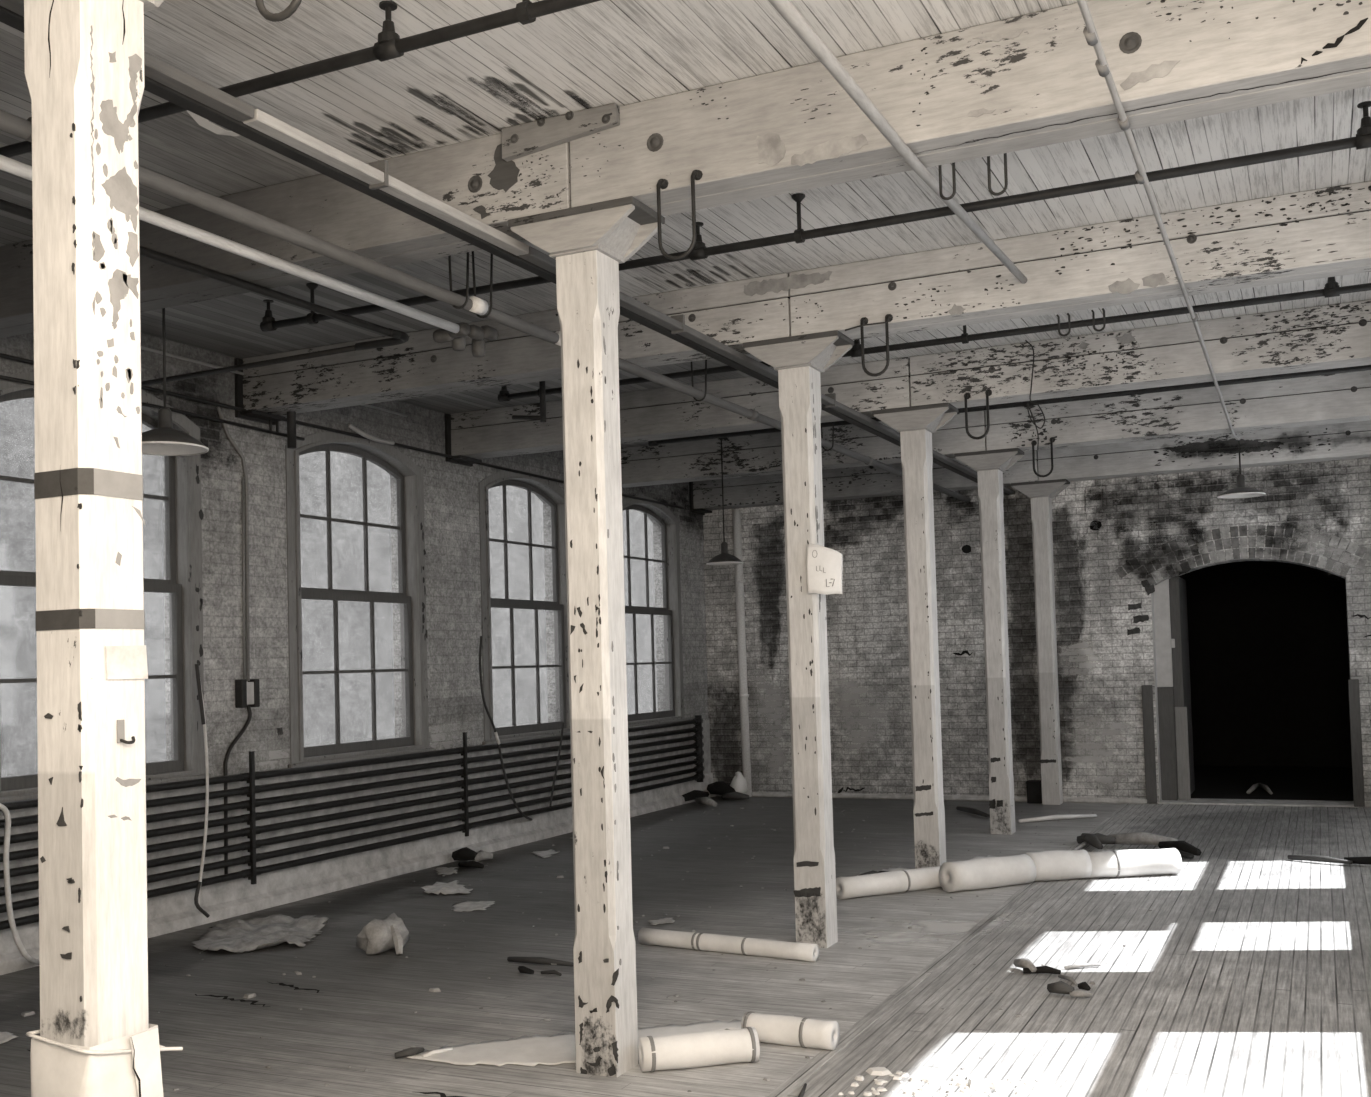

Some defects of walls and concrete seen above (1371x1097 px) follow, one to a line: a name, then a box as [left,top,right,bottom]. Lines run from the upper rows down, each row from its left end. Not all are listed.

damp [325,68,591,157]
crack [890,18,1371,159]
peeling [70,25,142,417]
peeling [1055,186,1371,294]
peeling [1062,332,1136,386]
peeling [1153,428,1330,466]
damp [1087,464,1348,579]
damp [753,516,785,666]
peeling [116,777,141,787]
peeling [793,887,826,947]
peeling [42,996,86,1038]
peeling [578,959,622,1076]